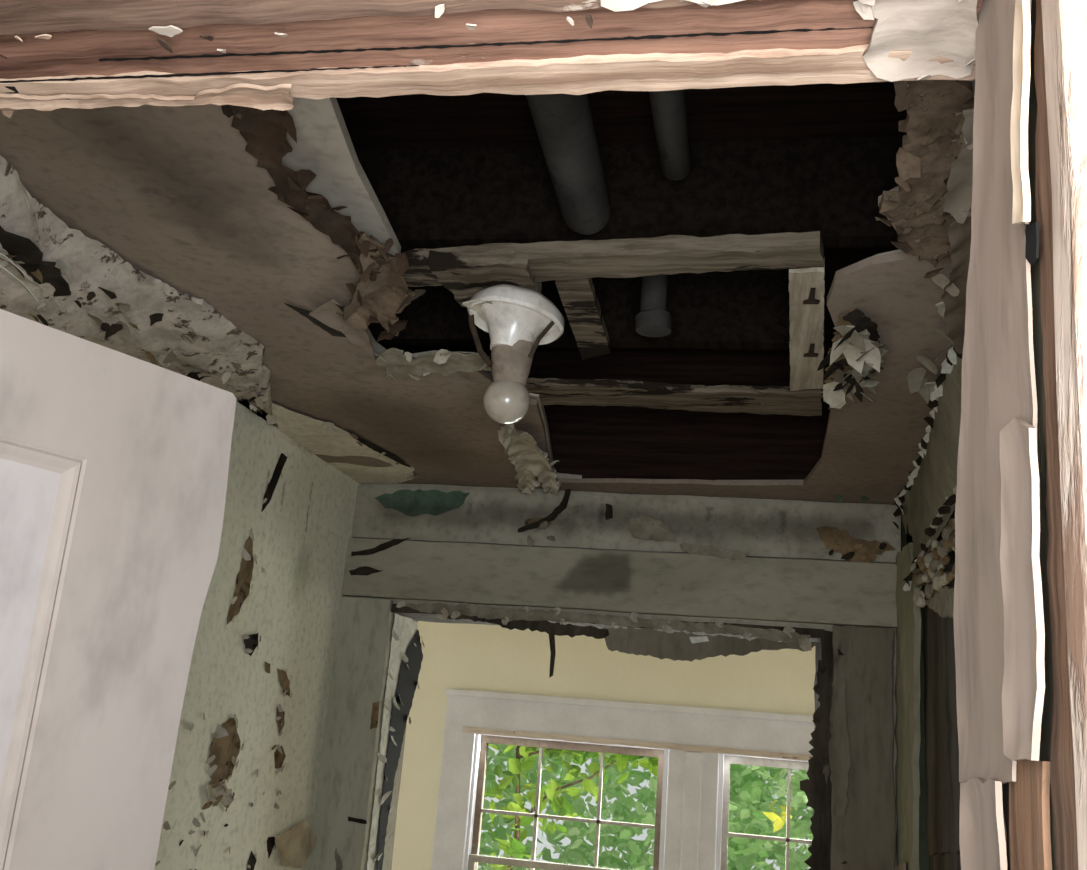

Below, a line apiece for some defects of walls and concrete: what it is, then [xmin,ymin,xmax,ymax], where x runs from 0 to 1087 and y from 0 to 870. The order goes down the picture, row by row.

peeling [601,0,662,12]
flaking render [0,226,71,306]
peeling [404,349,451,380]
flaking render [817,308,888,410]
peeling [853,0,1045,870]
peeling [227,529,258,624]
flaking render [816,526,896,562]
flaking render [242,633,261,656]
flaking render [179,714,244,870]
peeling [265,662,292,774]
peeling [367,613,425,870]
peeling [813,679,851,817]